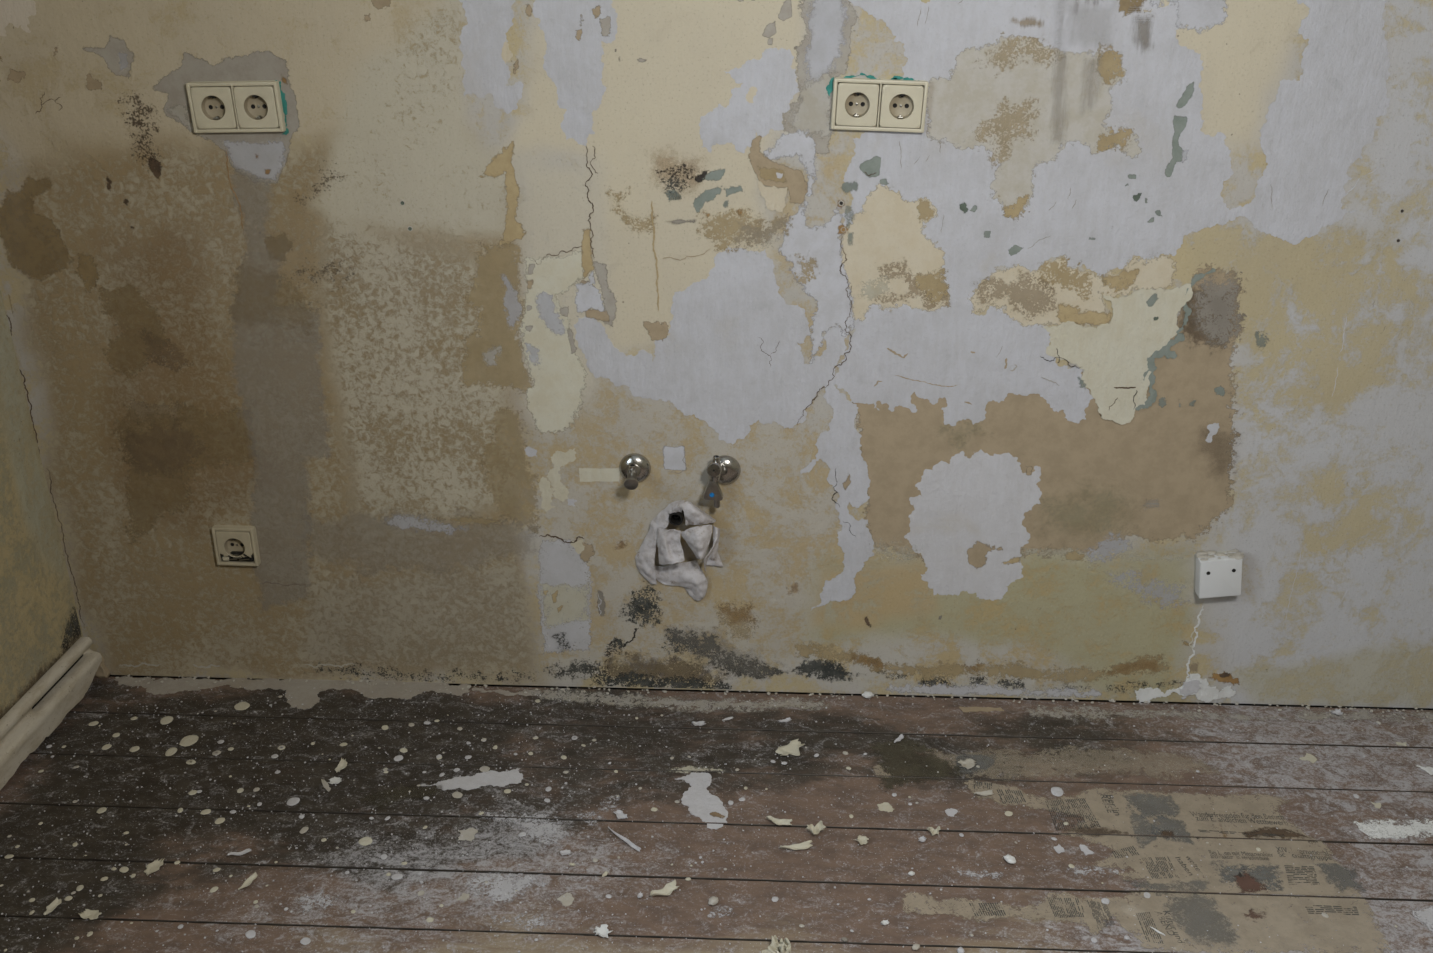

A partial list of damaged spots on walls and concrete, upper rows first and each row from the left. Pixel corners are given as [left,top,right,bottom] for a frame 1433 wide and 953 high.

flaking render [666,135,808,213]
flaking render [762,0,858,154]
peeling [899,33,1162,223]
peeling [1165,82,1194,177]
peeling [840,156,950,321]
peeling [460,141,617,512]
peeling [643,321,669,341]
flaking render [852,236,1269,561]
peeling [537,539,605,653]
leakage [313,581,860,689]
leakage [877,670,1026,689]
crack [1186,606,1204,679]